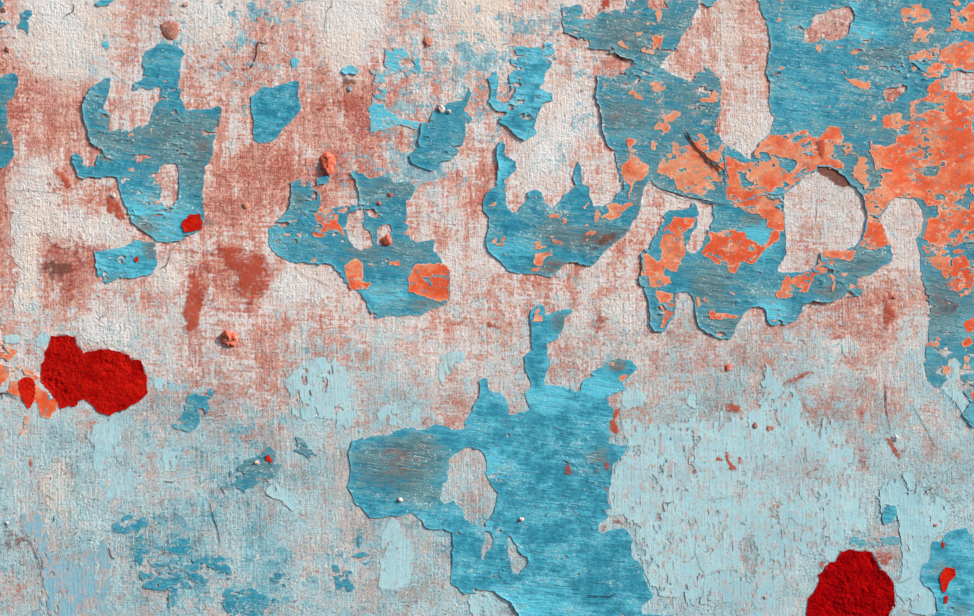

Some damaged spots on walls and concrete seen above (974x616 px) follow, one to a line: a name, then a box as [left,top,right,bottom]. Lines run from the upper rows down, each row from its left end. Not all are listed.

peeling [0,43,221,315]
peeling [269,170,451,318]
crack [684,128,729,177]
peeling [483,0,974,427]
spalling [0,315,165,501]
peeling [172,389,214,432]
peeling [284,304,974,616]